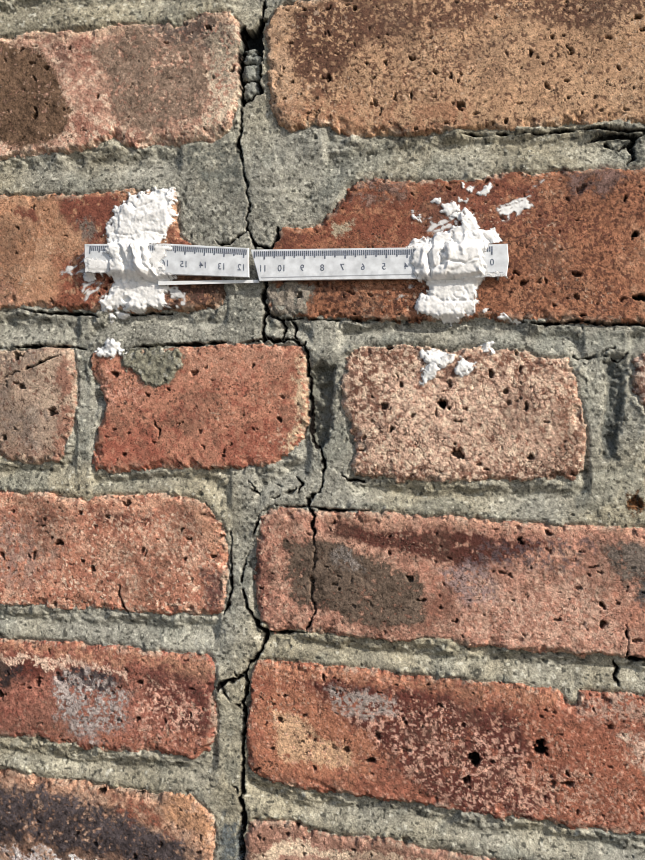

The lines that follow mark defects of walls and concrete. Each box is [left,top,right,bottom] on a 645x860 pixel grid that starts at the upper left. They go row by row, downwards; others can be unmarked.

crack [219,2,280,250]
crack [464,126,645,165]
crack [139,340,227,348]
crack [248,281,410,540]
crack [519,319,645,327]
crack [216,538,316,860]